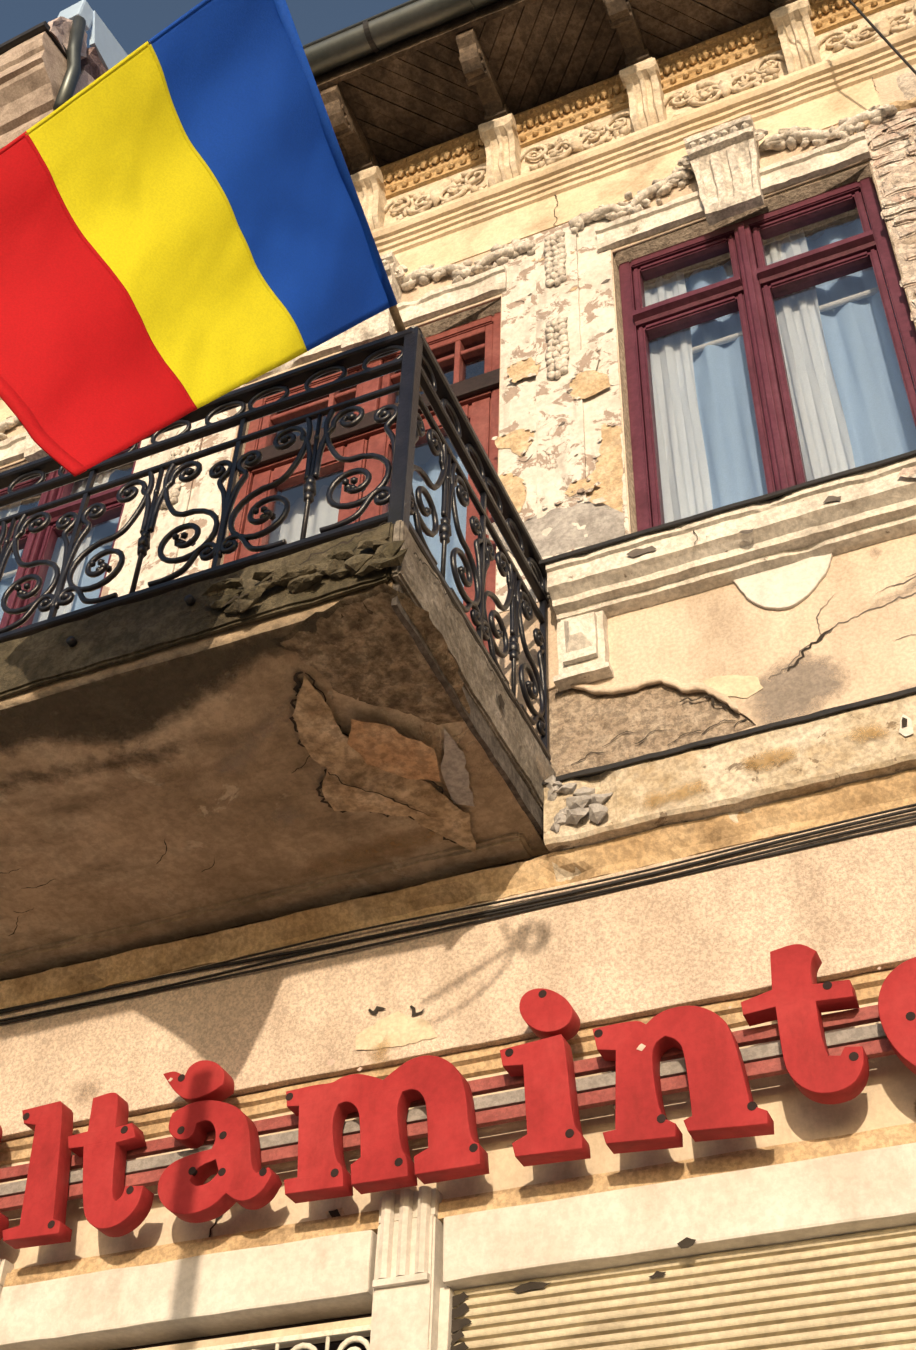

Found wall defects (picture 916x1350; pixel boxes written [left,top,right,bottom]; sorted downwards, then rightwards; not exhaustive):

flaking render [853,69,916,323]
peeling [506,356,541,383]
peeling [566,348,611,399]
peeling [554,422,623,513]
crack [768,573,916,679]
peeling [201,522,476,854]
flaking render [548,673,763,776]